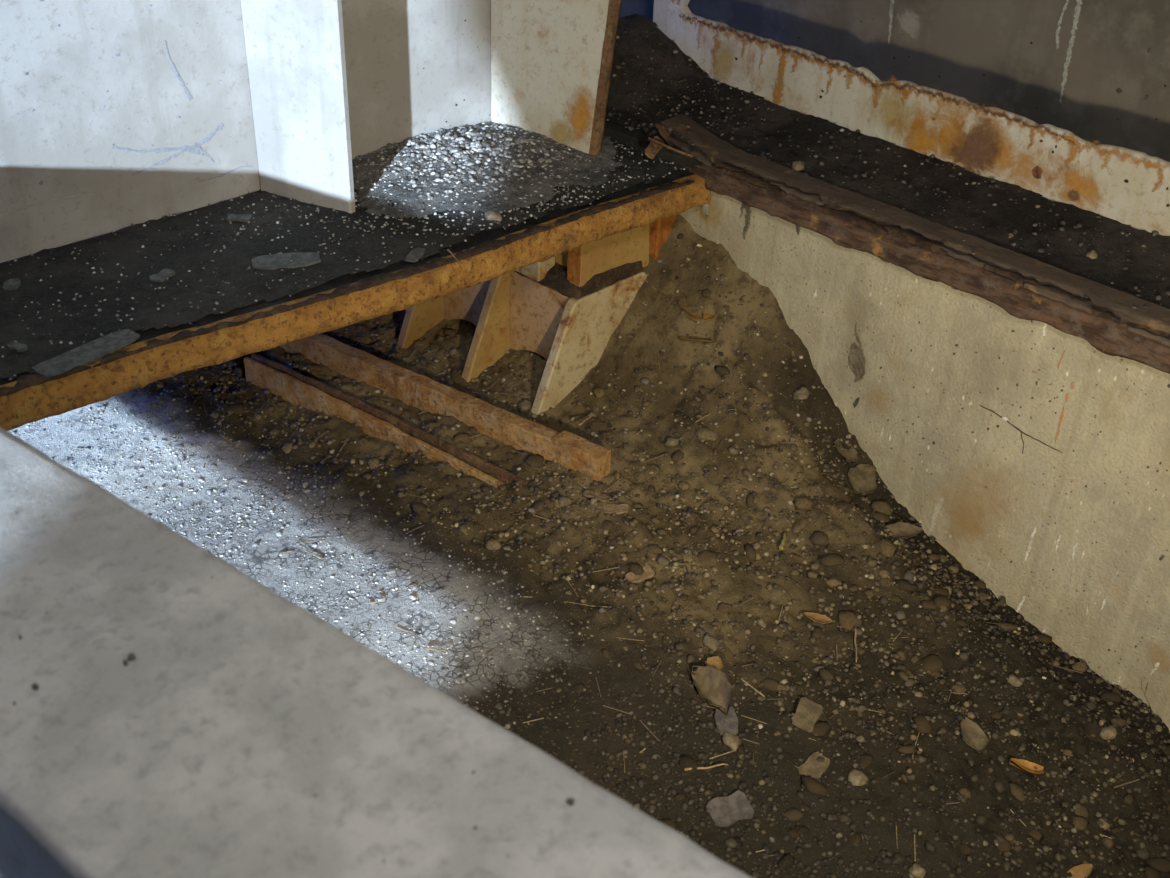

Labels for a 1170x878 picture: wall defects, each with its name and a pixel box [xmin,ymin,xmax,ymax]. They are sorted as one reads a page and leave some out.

rust [553,94,590,142]
rust [671,0,1168,204]
leakage [1055,0,1083,103]
rust [645,122,1170,346]